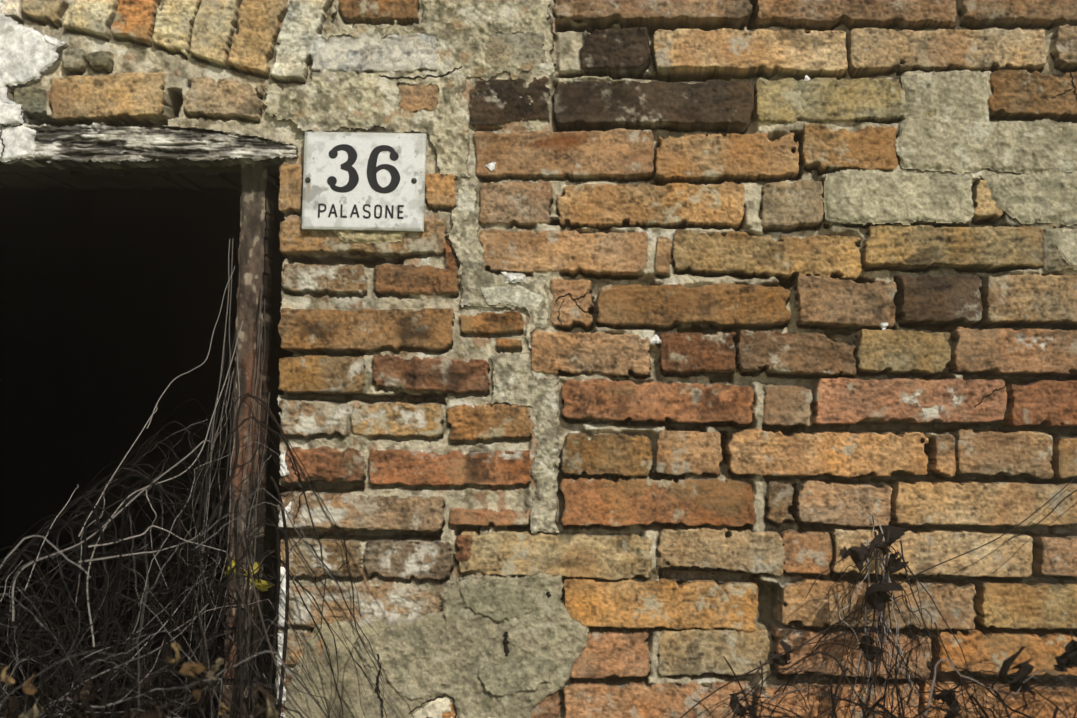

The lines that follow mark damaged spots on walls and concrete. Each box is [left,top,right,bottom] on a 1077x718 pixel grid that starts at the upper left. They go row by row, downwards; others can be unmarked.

flaking render [0,13,69,164]
crack [375,654,384,717]
flaking render [354,571,589,718]